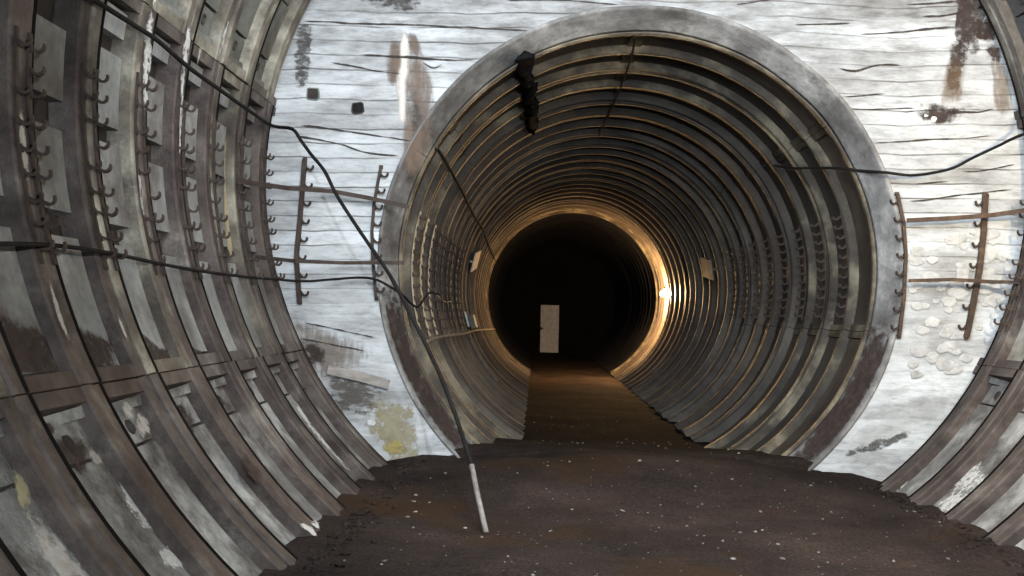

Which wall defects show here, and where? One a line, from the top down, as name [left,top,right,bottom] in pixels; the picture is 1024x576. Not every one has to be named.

damp [371,0,419,11]
crack [306,21,528,31]
crack [508,0,617,8]
crack [797,1,958,35]
crack [332,54,470,74]
damp [396,33,422,127]
crack [841,64,913,110]
rust [987,45,1000,62]
crack [300,125,433,157]
damp [330,377,381,414]
damp [794,326,889,460]
damp [847,433,907,456]